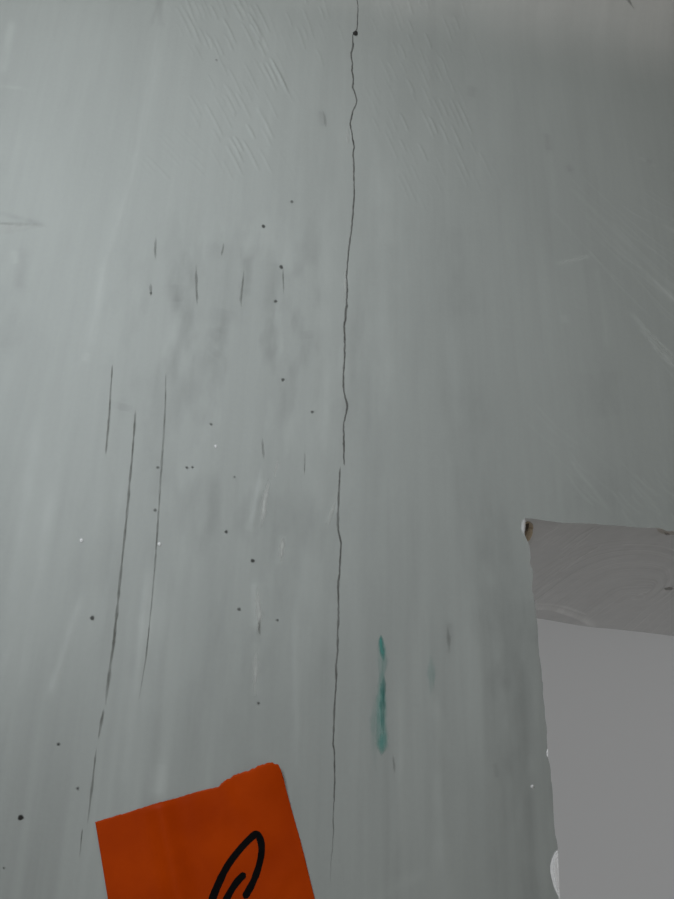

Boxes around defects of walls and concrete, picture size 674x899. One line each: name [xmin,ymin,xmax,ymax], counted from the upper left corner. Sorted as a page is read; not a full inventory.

crack [338,1,358,505]
crack [332,527,342,810]